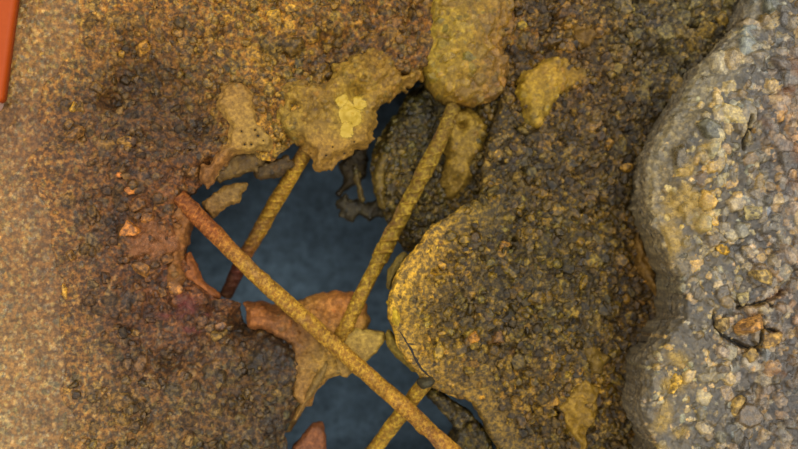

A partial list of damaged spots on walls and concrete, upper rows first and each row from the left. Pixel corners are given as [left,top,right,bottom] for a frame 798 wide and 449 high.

corrosion [131,208,194,288]
spalling [27,0,445,449]